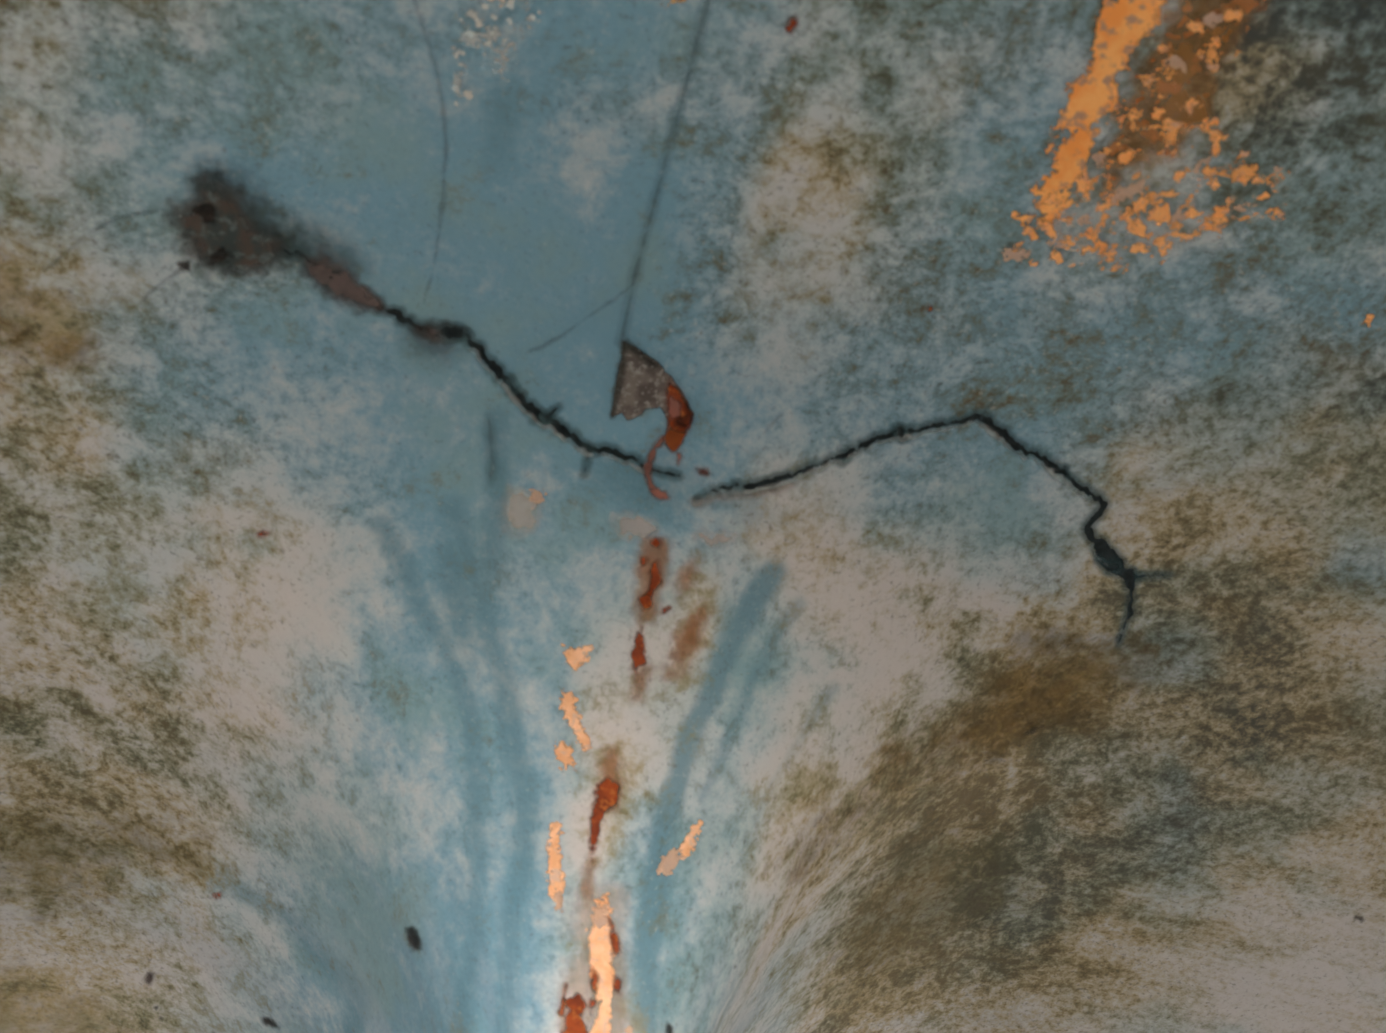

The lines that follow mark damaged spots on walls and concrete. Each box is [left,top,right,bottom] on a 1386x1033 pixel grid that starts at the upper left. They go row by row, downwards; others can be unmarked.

peeling [451,0,541,107]
peeling [1001,0,1290,274]
damp [170,172,333,276]
crack [283,247,311,263]
crack [377,306,426,330]
spalling [611,341,694,452]
crack [463,331,1166,643]
rust [631,537,671,690]
rust [675,608,704,659]
rust [589,751,620,851]
rust [558,983,588,1033]